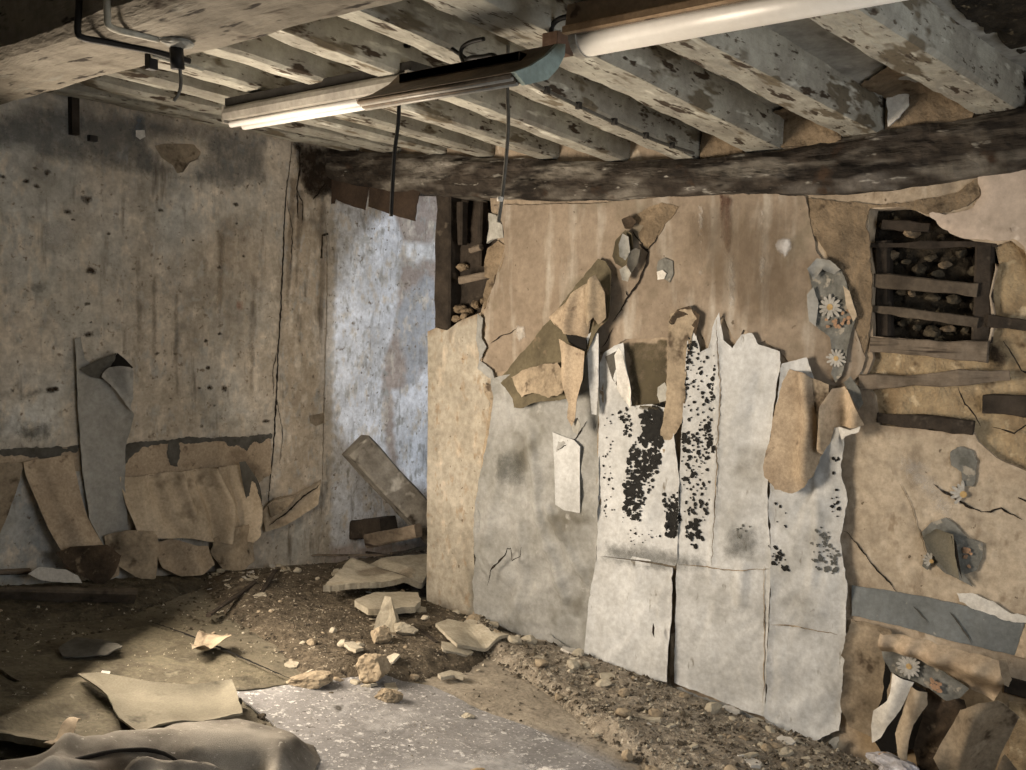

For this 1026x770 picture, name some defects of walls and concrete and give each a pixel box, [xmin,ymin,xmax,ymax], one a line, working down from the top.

spalling [862,66,934,101]
spalling [809,178,981,355]
peeling [511,362,564,398]
peeling [657,383,667,402]
peeling [0,454,103,550]
peeling [552,432,580,513]
leakage [602,337,716,562]
peeling [763,369,830,494]
crack [934,484,1026,520]
leakage [768,545,790,572]
leakage [810,527,841,574]
crack [844,531,897,592]